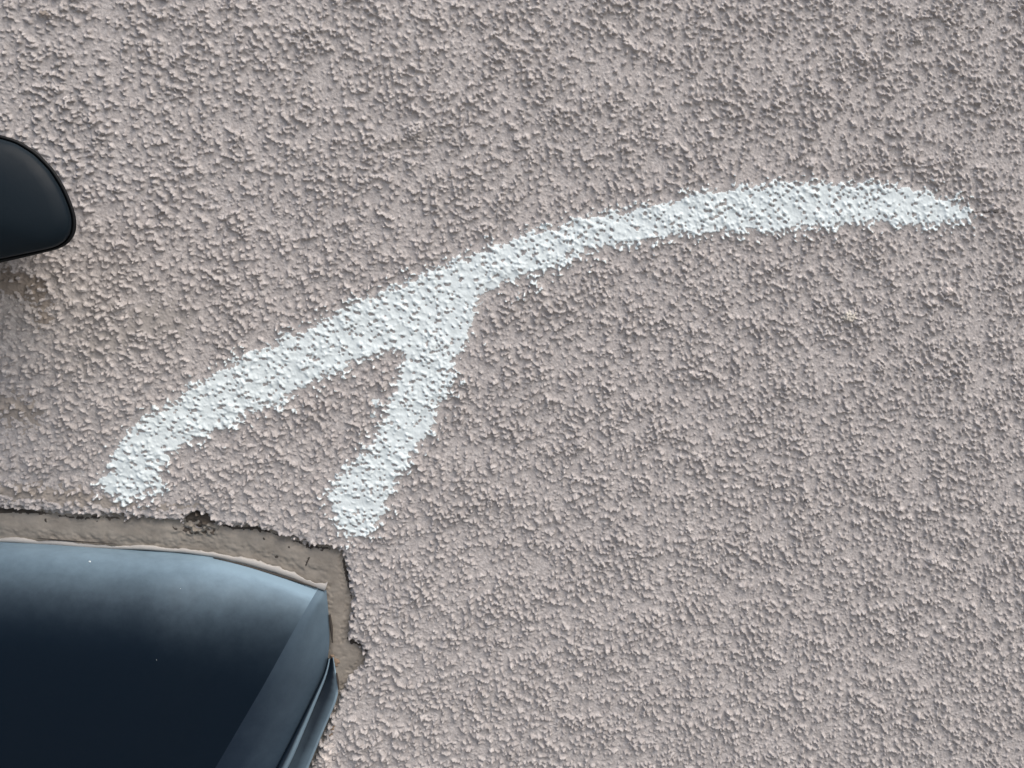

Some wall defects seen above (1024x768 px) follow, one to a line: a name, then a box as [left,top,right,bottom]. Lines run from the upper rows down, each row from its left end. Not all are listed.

peeling [0,507,366,767]